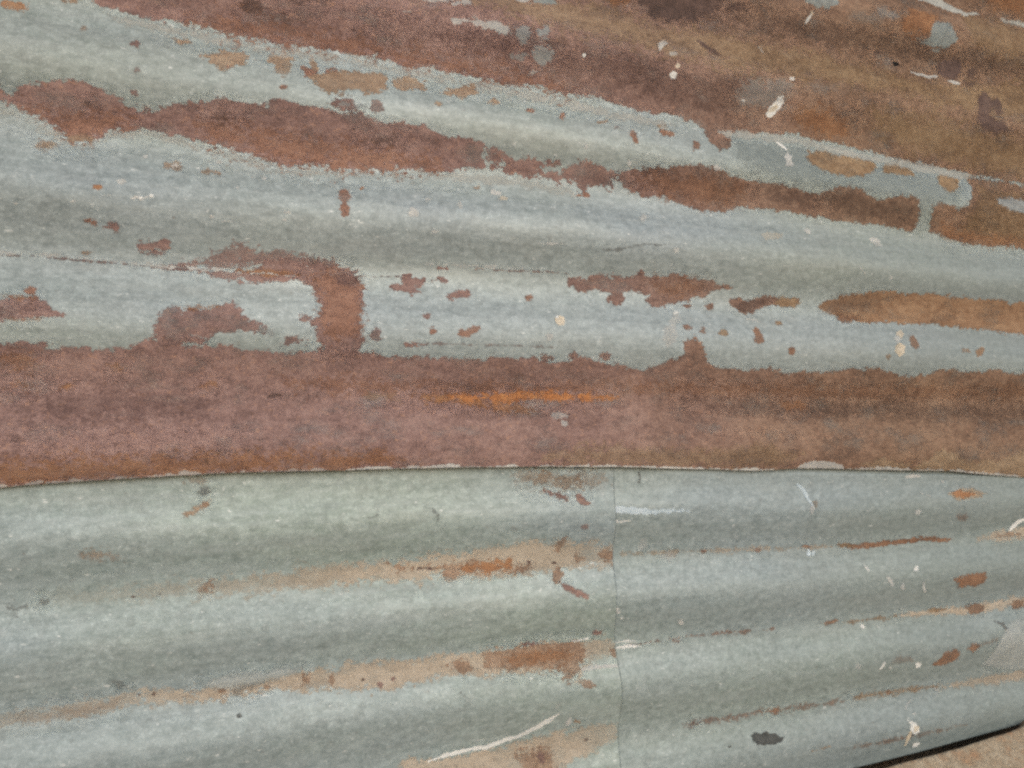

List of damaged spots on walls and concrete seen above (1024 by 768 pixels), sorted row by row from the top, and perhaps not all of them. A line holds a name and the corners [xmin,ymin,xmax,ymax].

rust [0,0,1024,251]
peeling [737,141,964,215]
rust [0,238,1024,488]
peeling [895,330,905,356]